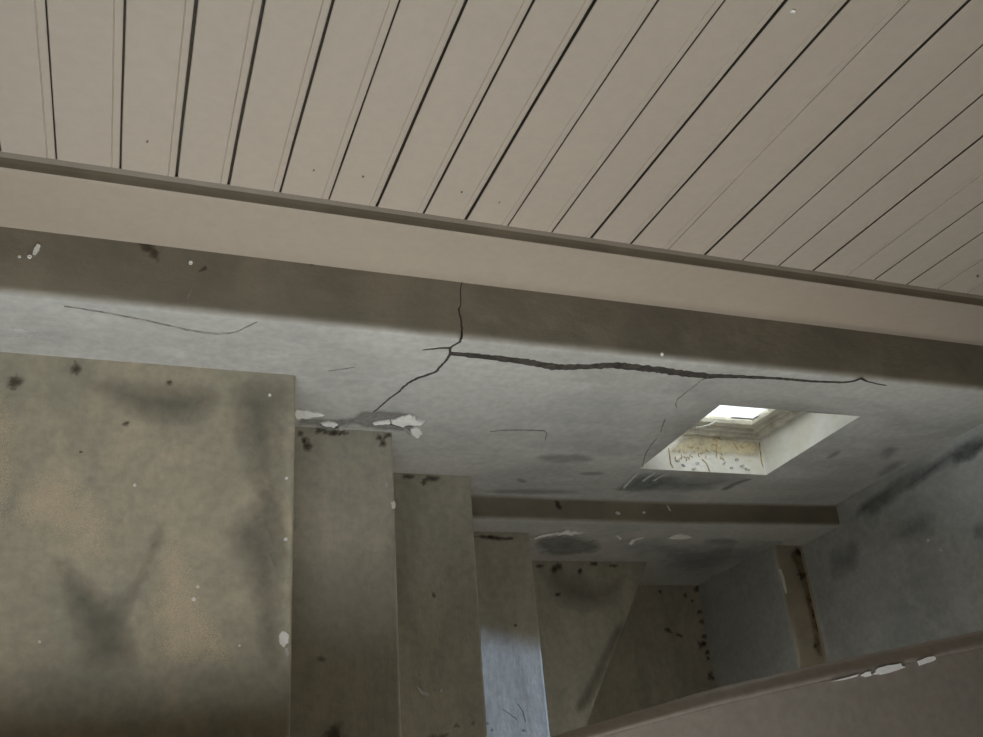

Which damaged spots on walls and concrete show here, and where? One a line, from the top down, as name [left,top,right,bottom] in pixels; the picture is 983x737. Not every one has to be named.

crack [64,285,257,335]
crack [373,282,887,468]
spalling [295,409,425,438]
peeling [531,529,595,554]
peeling [831,663,905,682]